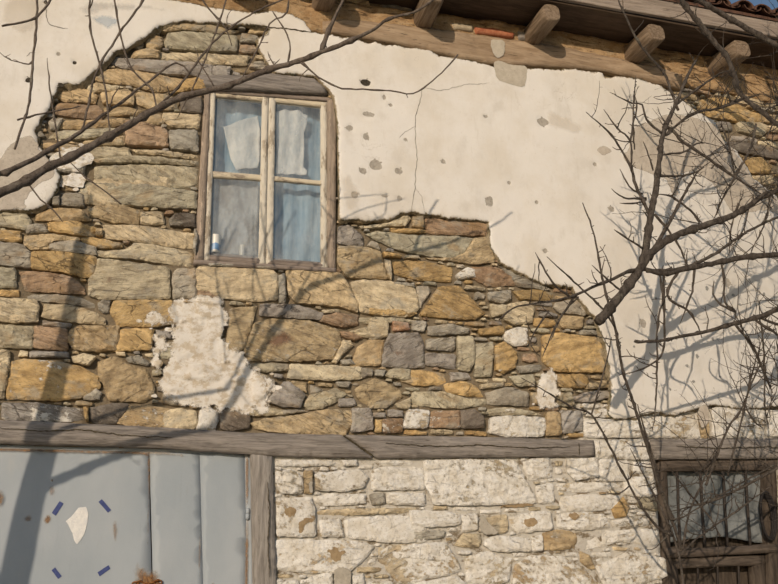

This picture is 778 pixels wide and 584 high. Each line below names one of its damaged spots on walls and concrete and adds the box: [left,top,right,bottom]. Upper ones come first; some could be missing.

flaking render [0,20,317,214]
flaking render [359,158,382,175]
crack [399,84,465,212]
flaking render [624,114,778,215]
flaking render [338,212,612,419]